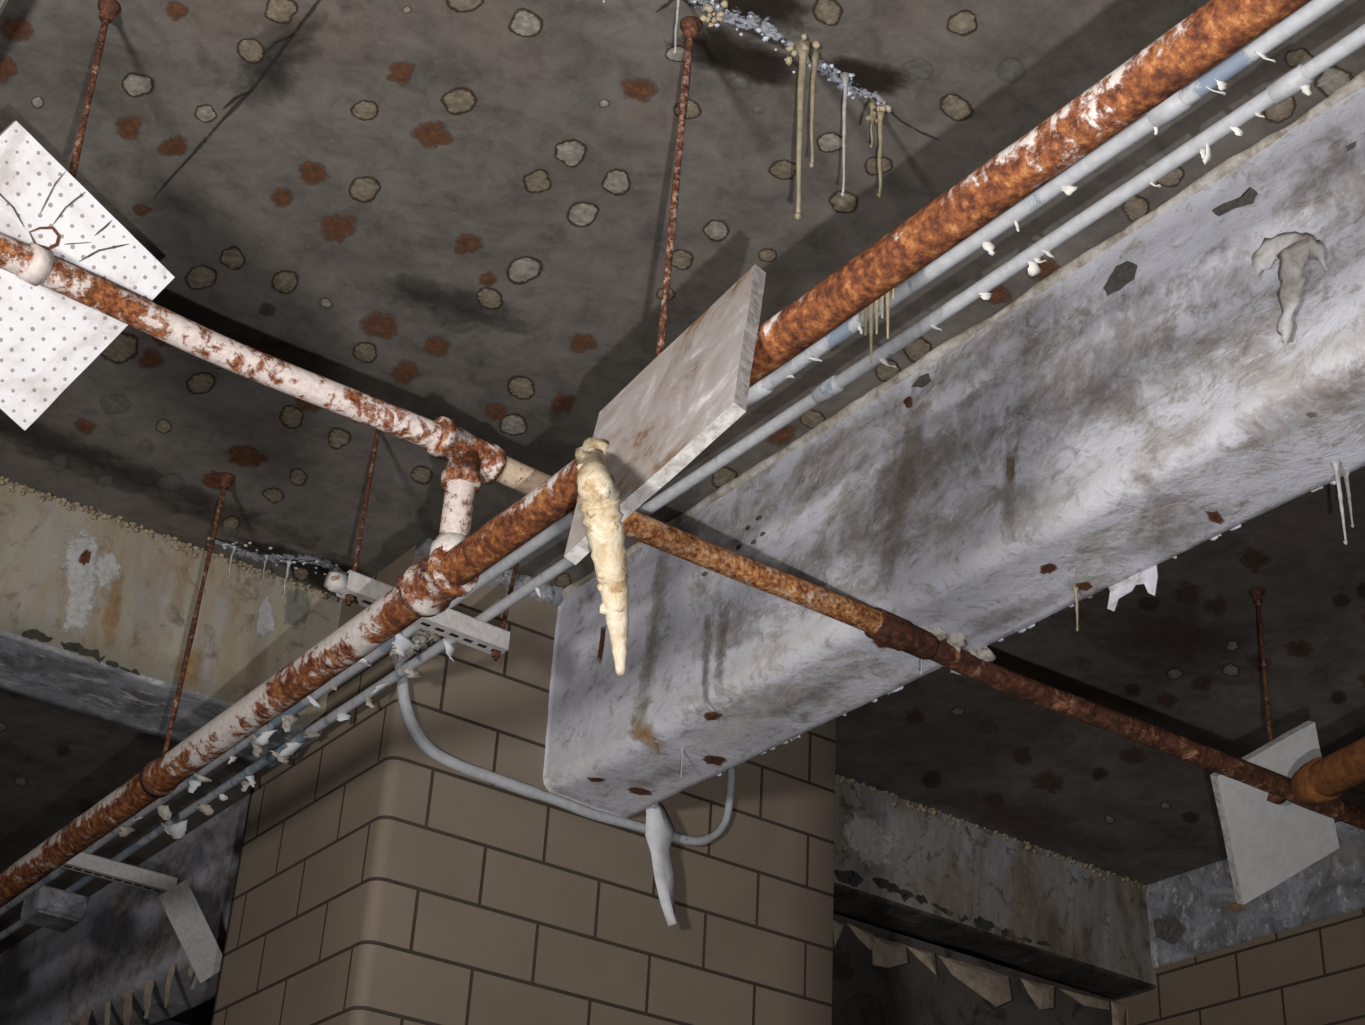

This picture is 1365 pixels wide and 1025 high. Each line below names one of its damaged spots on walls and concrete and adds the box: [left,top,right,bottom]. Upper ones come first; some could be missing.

damp [719,0,807,24]
damp [683,29,792,84]
damp [826,59,902,94]
corrosion [414,121,454,148]
peeling [1252,231,1328,343]
corrosion [296,398,321,412]
peeling [63,523,122,634]
corrosion [597,627,606,660]
corrosion [704,712,722,720]
corrosion [632,725,659,747]
corrosion [703,755,725,765]
corrosion [629,787,651,795]